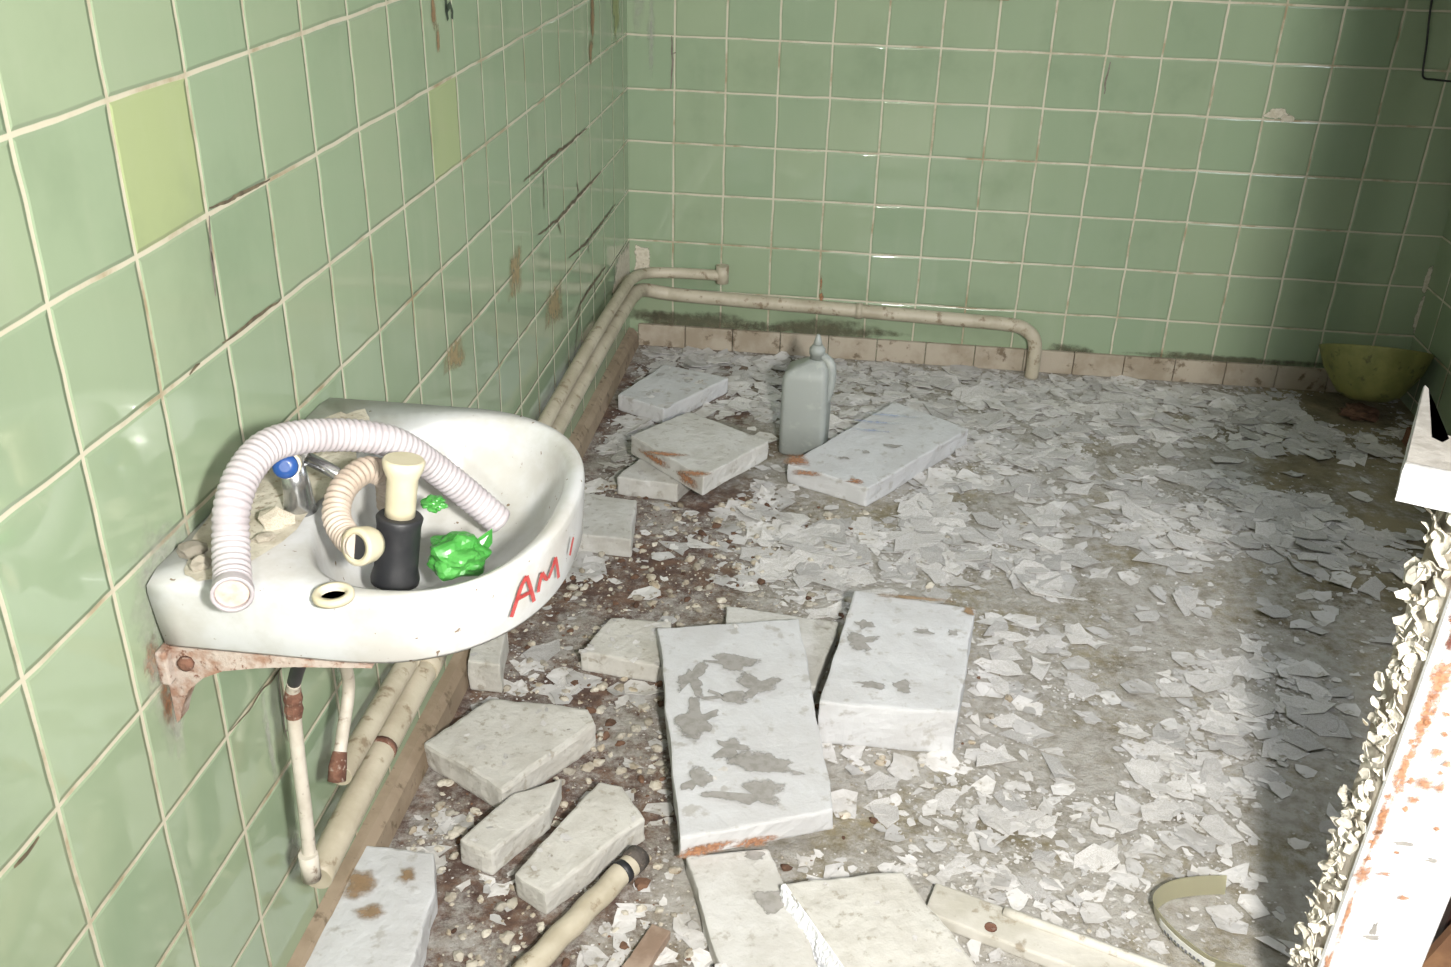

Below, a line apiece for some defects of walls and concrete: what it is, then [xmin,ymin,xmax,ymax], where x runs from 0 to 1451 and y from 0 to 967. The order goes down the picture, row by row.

crack [189,299,281,375]
corrosion [145,643,175,723]
peeling [1288,507,1451,967]
corrosion [1324,616,1451,967]
spalling [780,884,844,967]